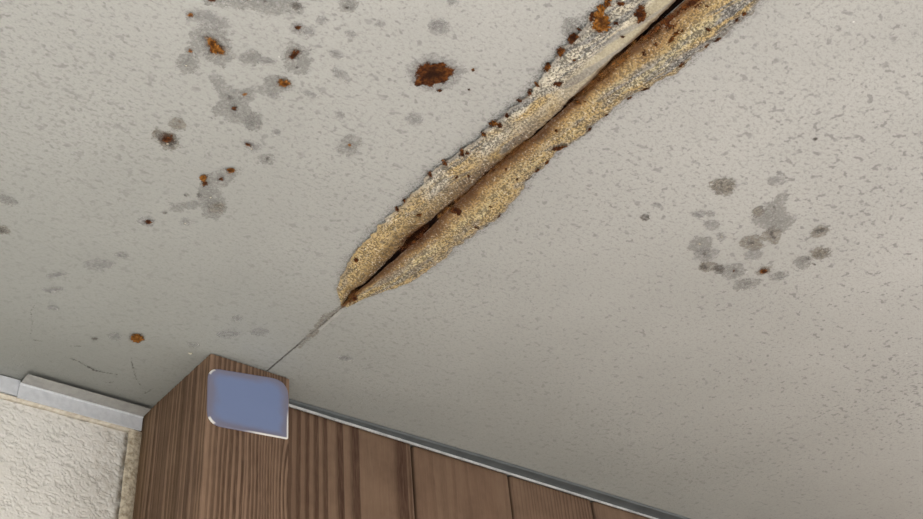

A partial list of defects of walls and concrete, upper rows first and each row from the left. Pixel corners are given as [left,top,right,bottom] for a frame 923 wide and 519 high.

corrosion [185,0,304,67]
corrosion [211,42,311,130]
corrosion [407,57,475,92]
corrosion [556,0,625,57]
corrosion [575,0,709,105]
corrosion [151,128,181,150]
water stain [138,168,236,226]
water stain [244,141,275,164]
crack [267,0,684,371]
corrosion [437,140,532,218]
water stain [687,171,796,291]
water stain [771,225,832,281]